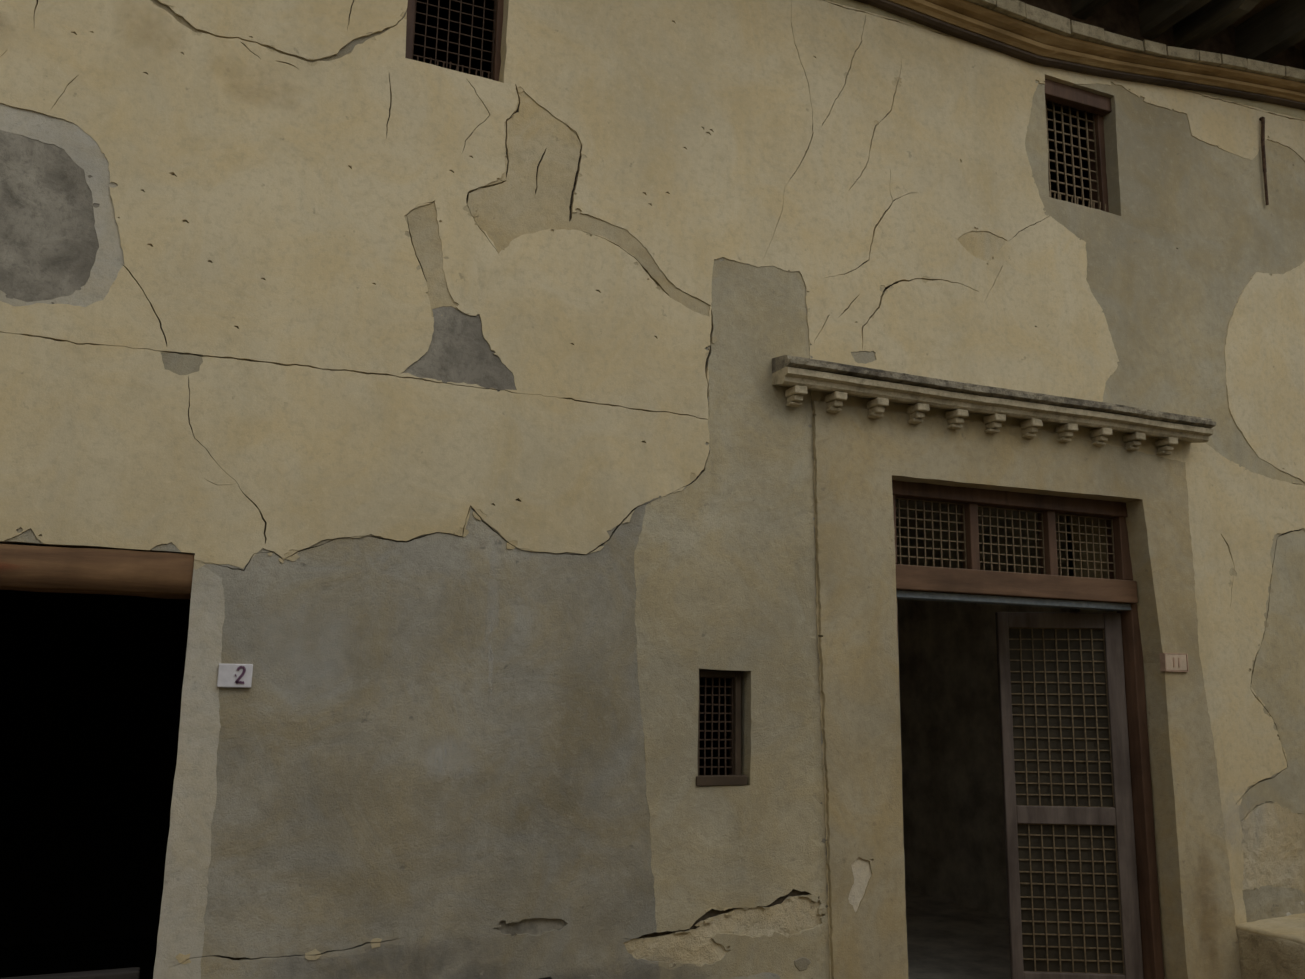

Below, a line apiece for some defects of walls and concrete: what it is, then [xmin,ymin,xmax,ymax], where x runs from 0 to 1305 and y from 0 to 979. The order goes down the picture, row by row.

crack [150,0,407,66]
spalling [0,104,124,307]
crack [844,261,933,327]
crack [128,271,284,439]
spalling [4,527,47,547]
spalling [150,542,182,554]
spalling [201,91,830,979]
spalling [1239,528,1305,916]
spalling [848,857,873,913]
crack [176,938,382,964]